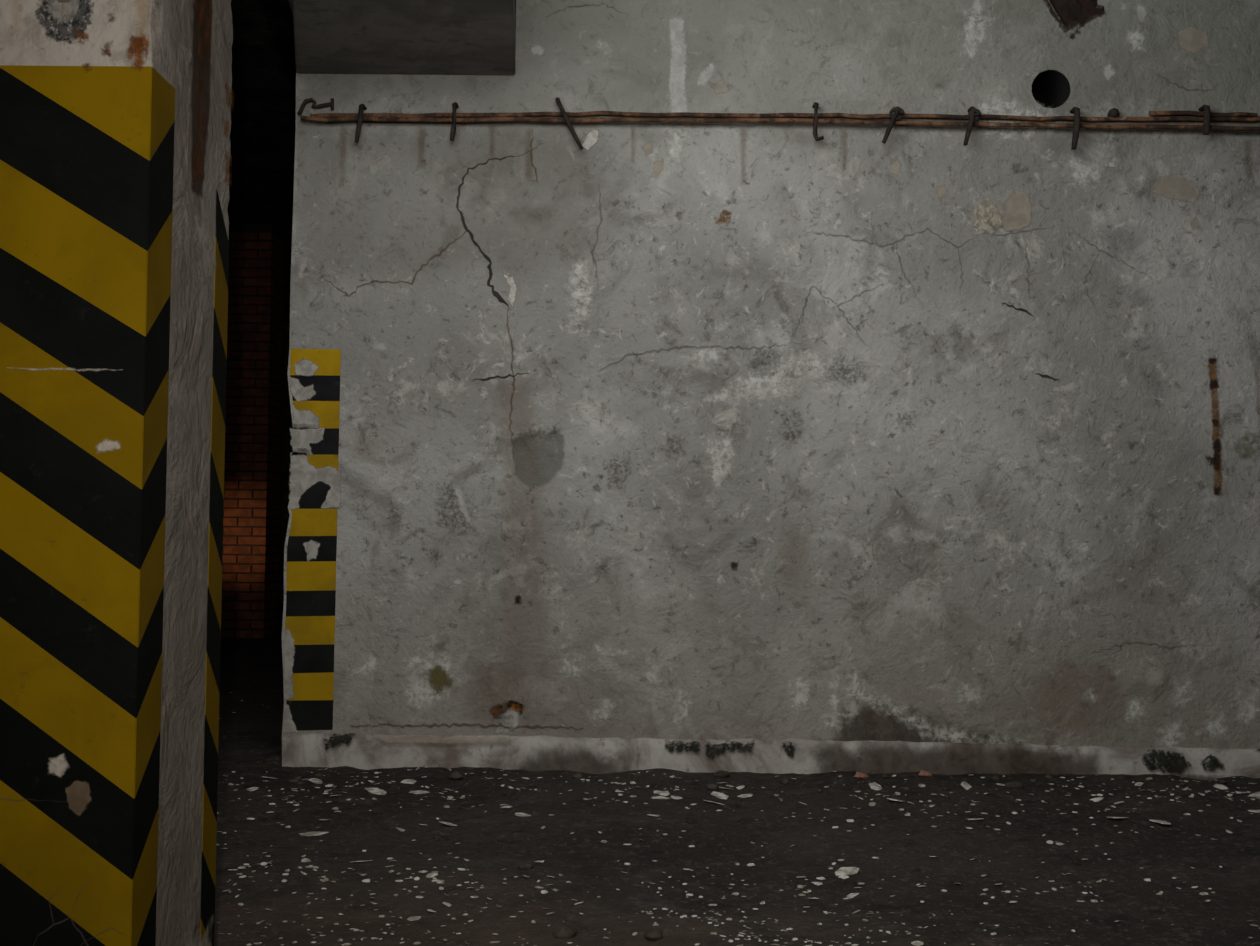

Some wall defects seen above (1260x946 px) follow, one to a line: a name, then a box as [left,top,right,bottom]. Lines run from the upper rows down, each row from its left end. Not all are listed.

spalling [1045,0,1105,39]
rust [192,0,212,195]
crack [456,156,515,306]
rust [1206,358,1222,495]
leakage [817,672,1096,776]
peeling [1142,748,1224,774]